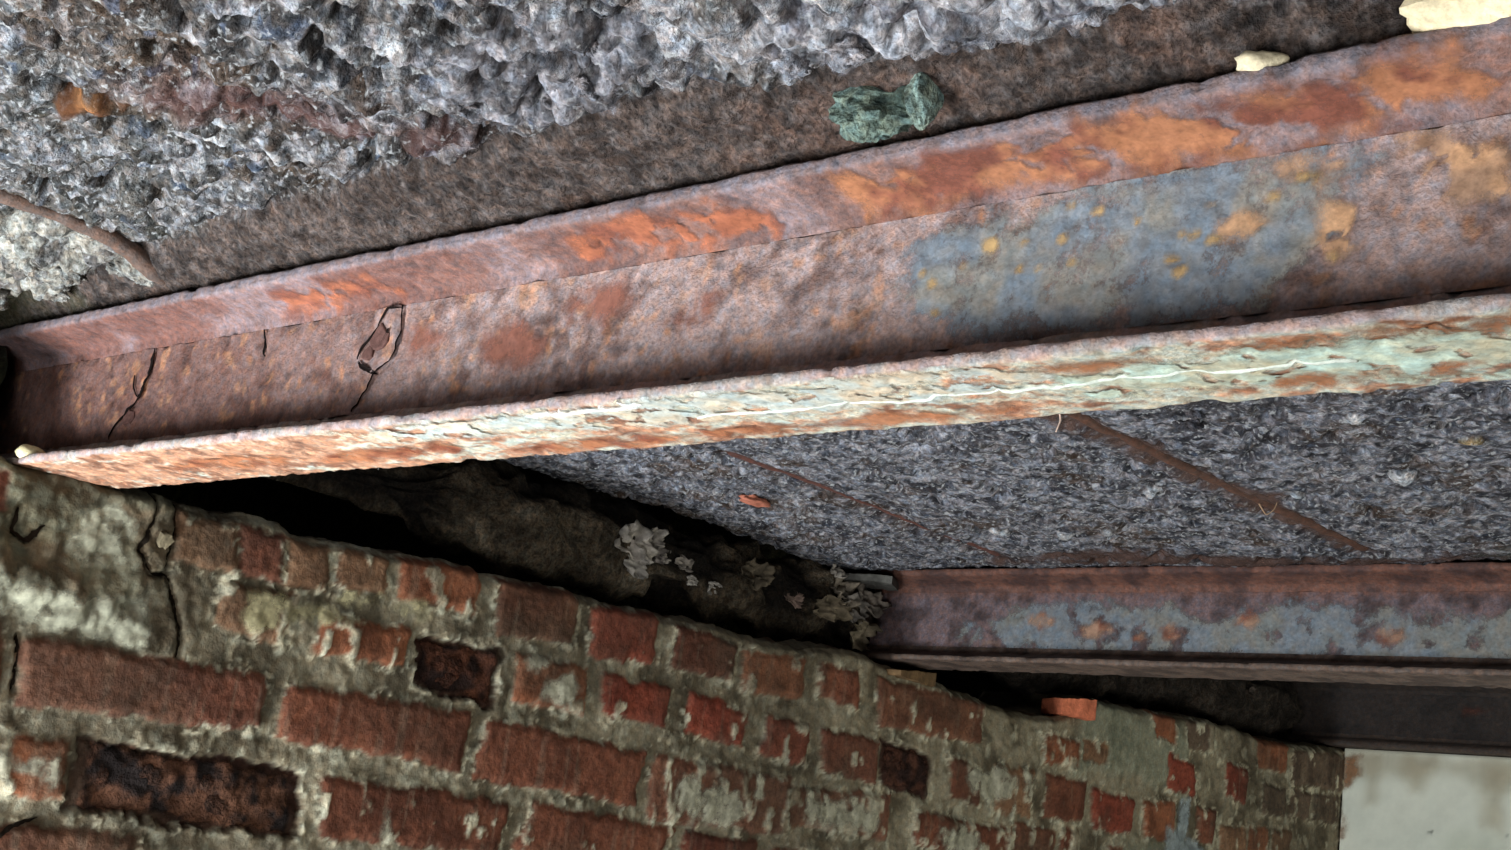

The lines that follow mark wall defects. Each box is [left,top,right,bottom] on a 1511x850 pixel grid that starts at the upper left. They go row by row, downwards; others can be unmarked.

corrosion [834,38,1510,220]
corrosion [567,209,782,262]
corrosion [1317,204,1354,254]
crack [351,305,404,412]
corrosion [1271,373,1357,388]
corrosion [1247,317,1511,352]
corrosion [323,444,462,463]
corrosion [513,427,779,452]
corrosion [992,413,1511,568]
crack [9,507,45,543]
crack [137,491,180,657]
crack [0,817,37,838]